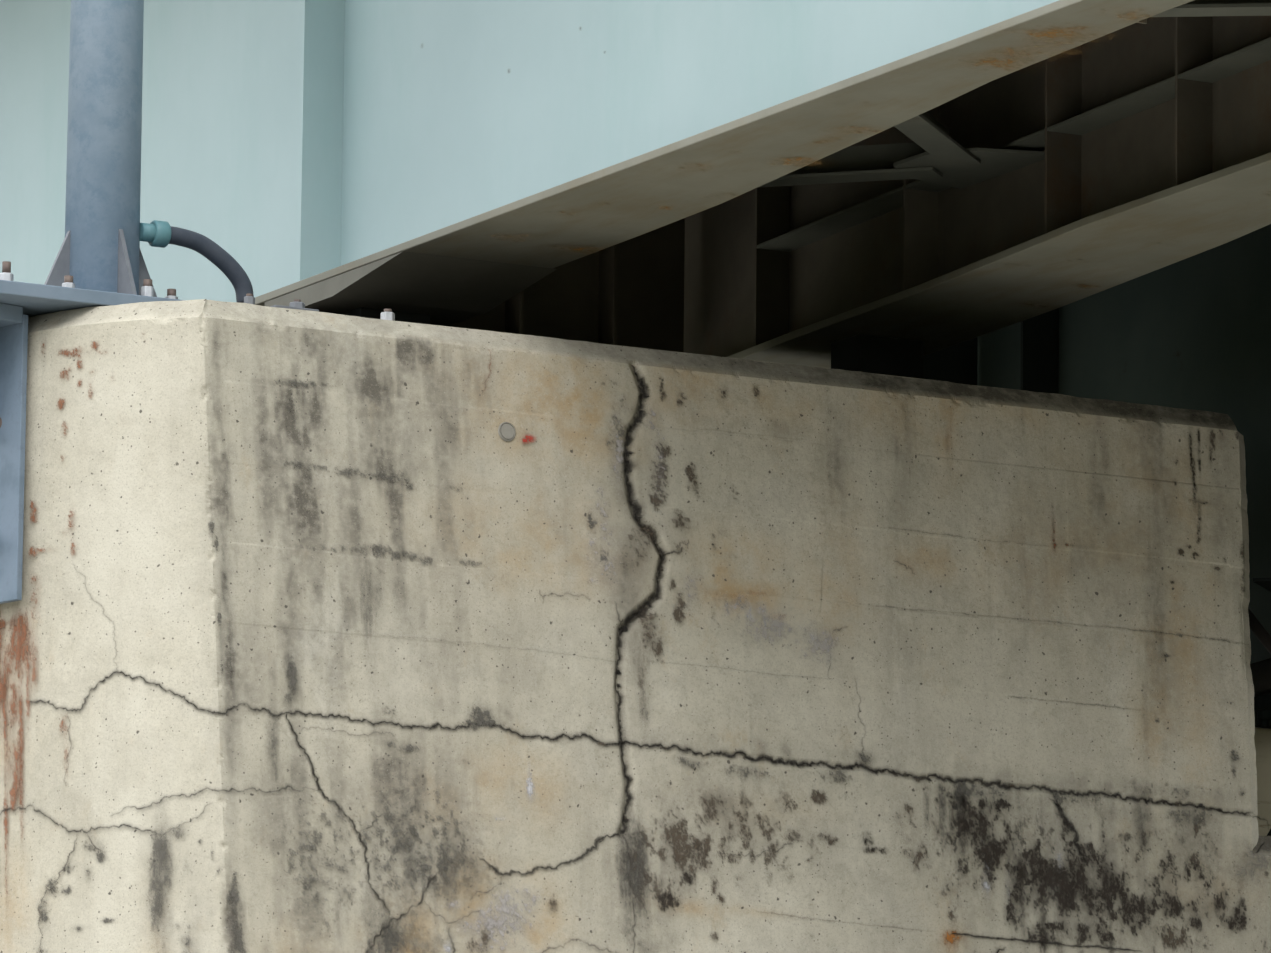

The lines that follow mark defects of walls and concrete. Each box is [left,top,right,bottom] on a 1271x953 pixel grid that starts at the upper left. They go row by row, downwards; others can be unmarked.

water stain [284,462,413,489]
water stain [372,544,432,564]
rust [0,576,37,849]
crack [0,365,1265,953]
water stain [812,771,851,804]
mould [620,797,799,911]
water stain [904,783,1247,952]